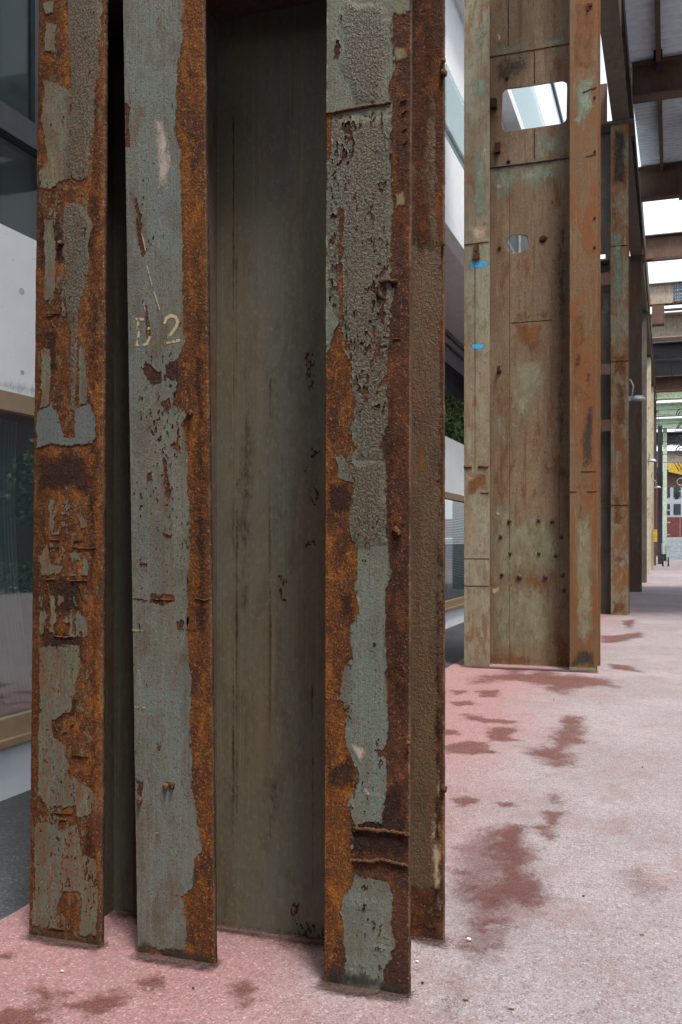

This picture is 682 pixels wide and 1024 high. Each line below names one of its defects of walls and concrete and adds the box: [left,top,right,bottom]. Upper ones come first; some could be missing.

rust [41,150,99,411]
peeling [39,0,103,410]
rust [393,0,437,247]
peeling [31,595,98,937]
rust [39,431,98,615]
peeling [123,0,213,967]
rust [328,762,403,855]
peeling [324,0,443,998]
damp [454,794,566,931]
damp [445,651,636,755]
damp [527,716,586,766]
damp [601,619,641,643]